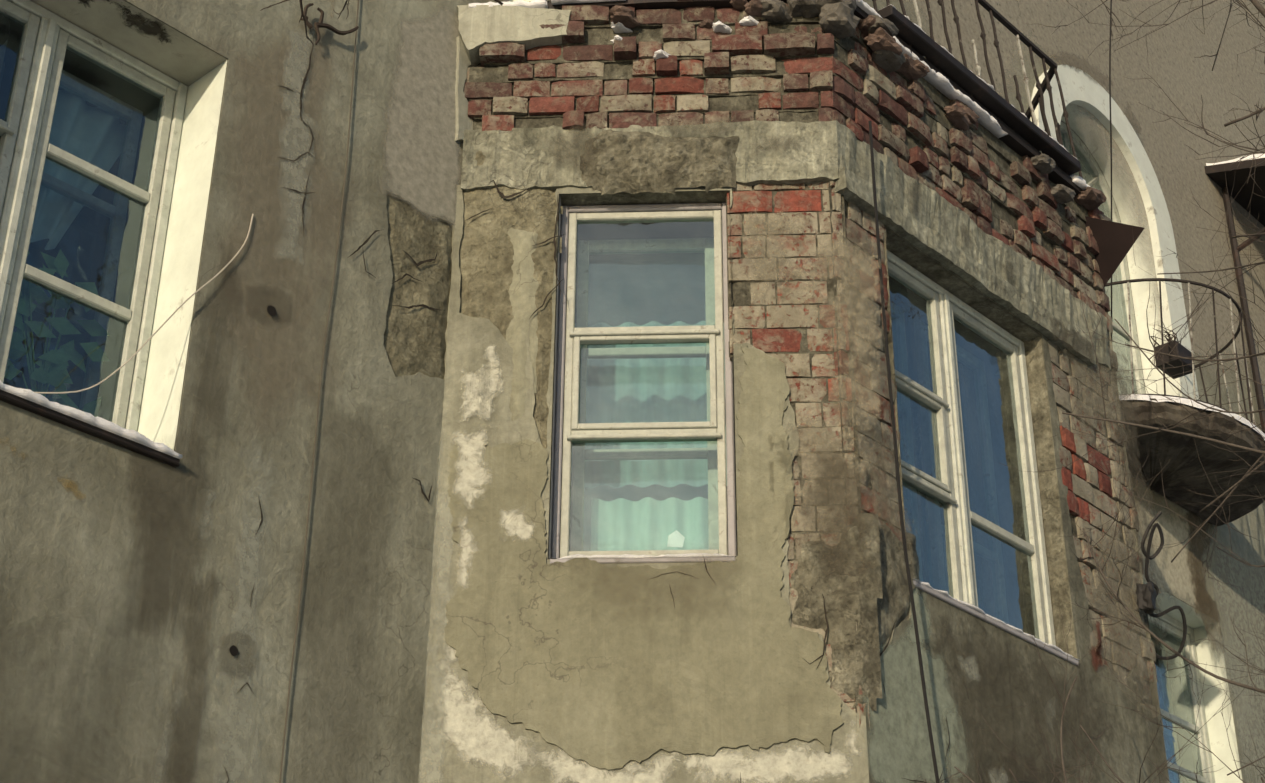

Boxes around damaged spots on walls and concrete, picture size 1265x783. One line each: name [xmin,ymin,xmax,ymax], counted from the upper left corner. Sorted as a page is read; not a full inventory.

crack [278,45,318,233]
spalling [383,186,563,506]
spalling [438,0,1164,783]